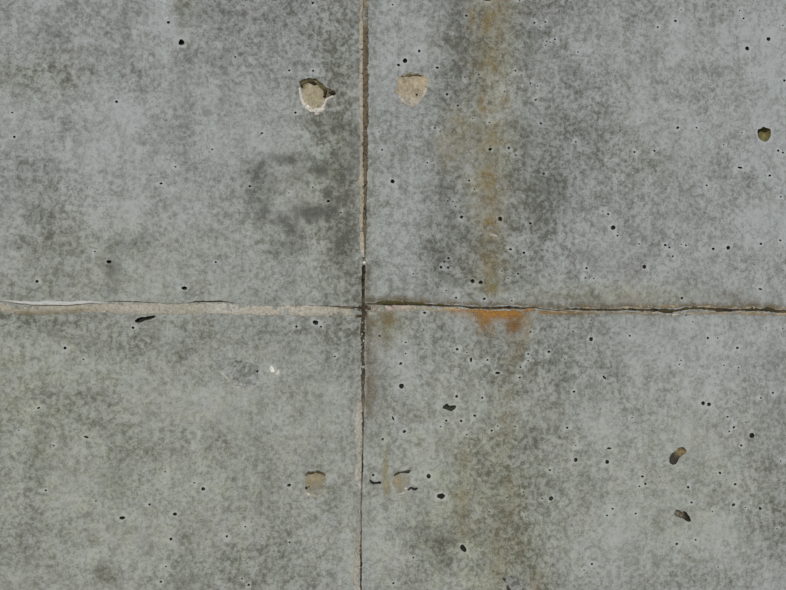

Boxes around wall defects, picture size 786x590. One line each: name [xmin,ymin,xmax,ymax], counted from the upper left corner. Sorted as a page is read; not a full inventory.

crack [77,265,786,590]
corrosion [472,308,536,331]